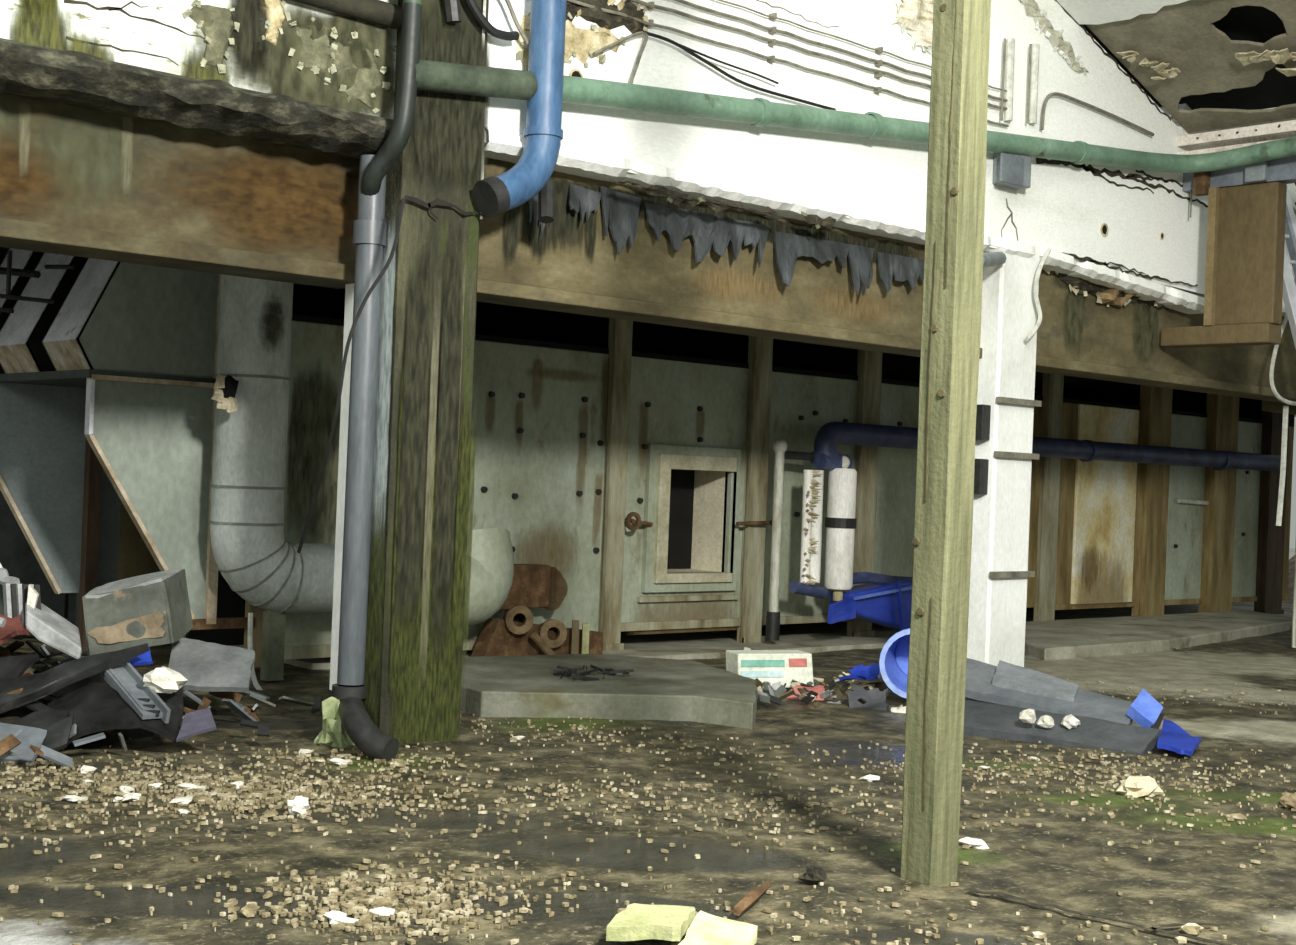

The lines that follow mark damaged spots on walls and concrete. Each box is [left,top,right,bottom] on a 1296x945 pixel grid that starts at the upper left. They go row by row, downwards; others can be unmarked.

damp [10,0,113,61]
crack [64,0,205,66]
peeling [183,0,240,74]
peeling [259,0,391,114]
peeling [516,12,530,71]
spalling [564,0,649,78]
spalling [892,0,934,54]
crack [1037,158,1208,208]
peeling [569,178,924,296]